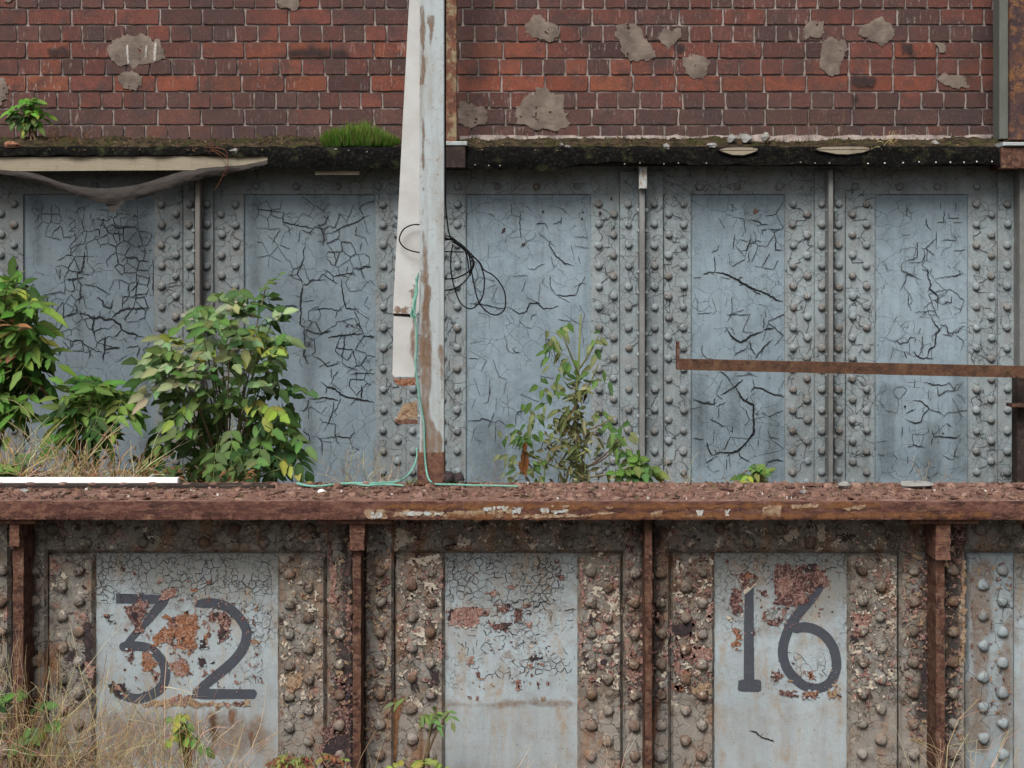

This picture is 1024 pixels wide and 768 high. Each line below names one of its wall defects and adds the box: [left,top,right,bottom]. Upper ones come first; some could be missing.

corrosion [420,7,434,84]
crack [32,200,183,363]
crack [223,197,397,453]
crack [445,198,813,472]
crack [847,202,997,476]
crack [96,554,273,684]
crack [446,554,575,679]
peeling [279,503,928,768]
corrosion [377,501,991,735]